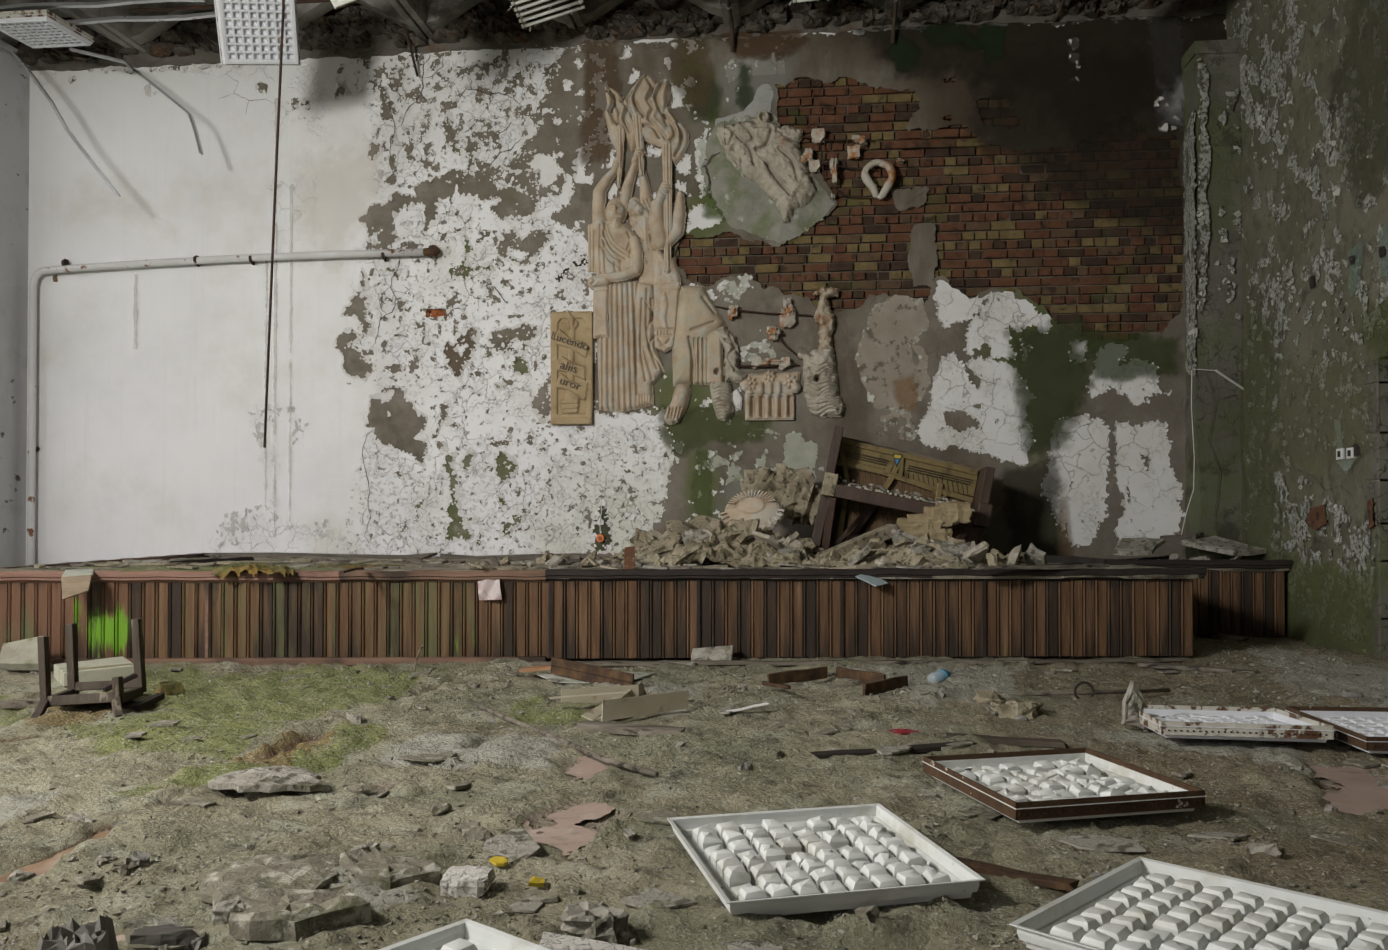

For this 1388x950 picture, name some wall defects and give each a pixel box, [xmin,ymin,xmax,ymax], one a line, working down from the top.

spalling [298,0,1388,612]
damp [1334,0,1388,203]